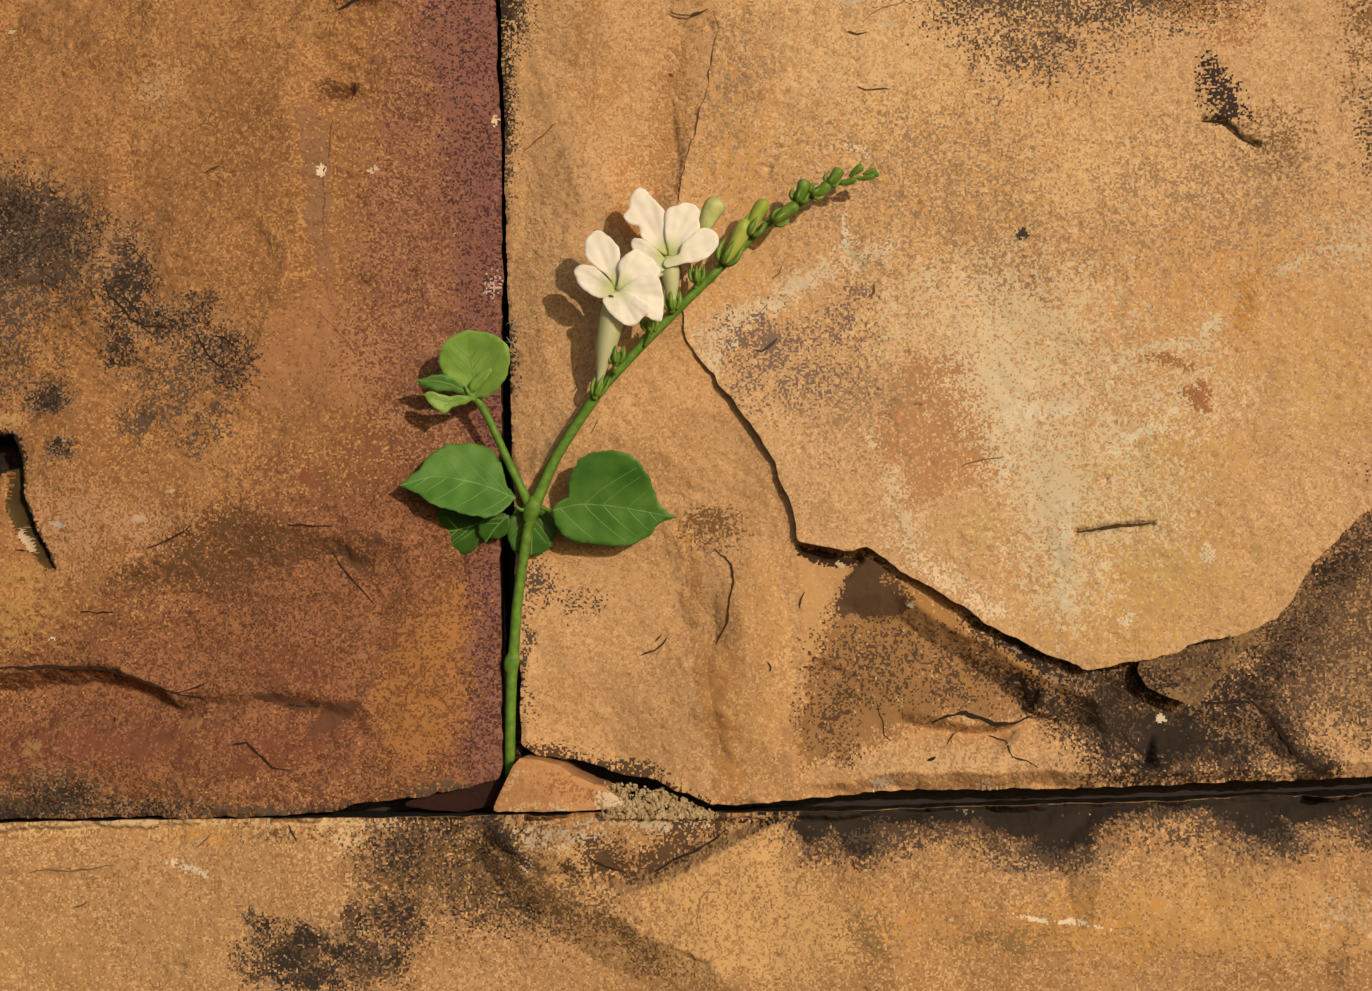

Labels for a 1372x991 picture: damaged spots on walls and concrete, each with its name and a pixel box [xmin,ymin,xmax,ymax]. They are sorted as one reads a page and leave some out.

spalling [0,411,30,430]
damp [0,121,424,604]
peeling [670,0,1372,783]
spalling [18,528,37,552]
crack [715,549,734,644]
damp [0,504,1372,991]
crack [927,710,1039,768]